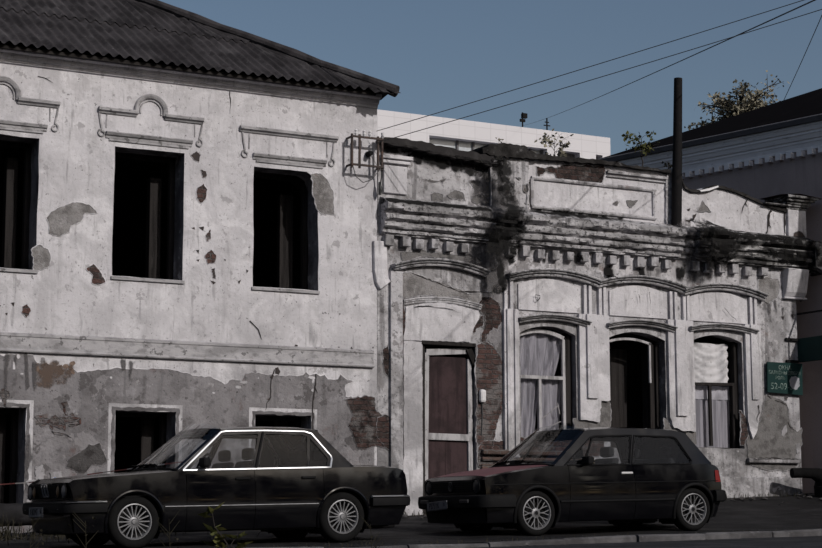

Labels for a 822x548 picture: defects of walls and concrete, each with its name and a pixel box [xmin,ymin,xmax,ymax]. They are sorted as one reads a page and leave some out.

flaking render [45,201,98,237]
flaking render [85,264,106,286]
flaking render [190,151,208,204]
flaking render [310,172,335,216]
water stain [380,143,624,295]
flaking render [536,163,606,183]
water stain [674,218,821,281]
crack [766,209,787,235]
flaking render [403,272,516,468]
peeling [0,352,390,502]
crack [311,374,319,429]
flaking render [739,394,803,472]